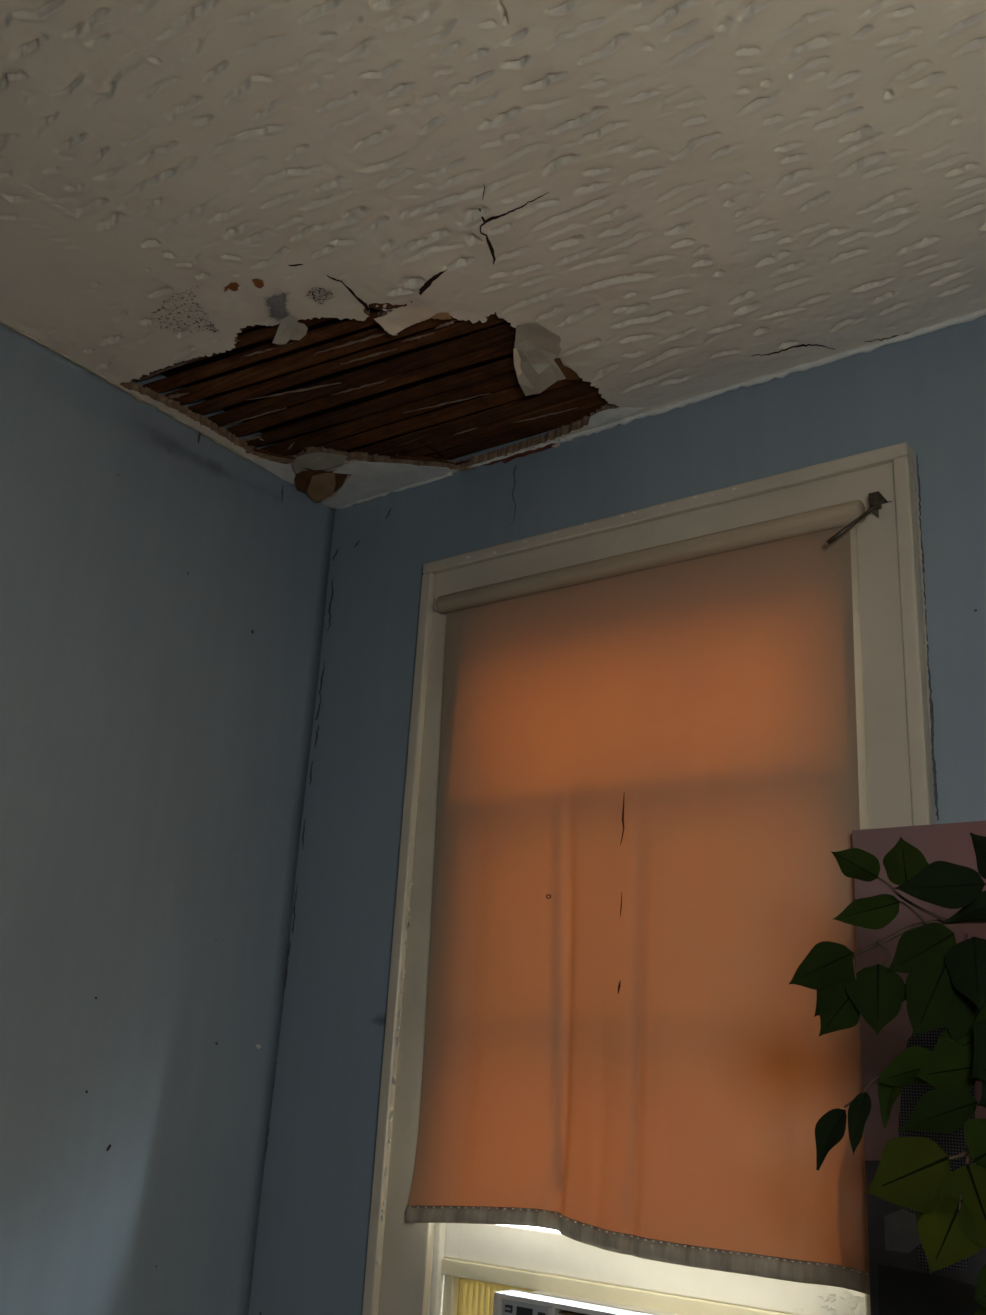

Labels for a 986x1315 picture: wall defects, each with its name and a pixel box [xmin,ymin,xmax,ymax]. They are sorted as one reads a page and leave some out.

crack [479,186,549,265]
peeling [272,316,308,345]
crack [288,264,447,311]
peeling [374,304,452,335]
peeling [513,322,580,396]
peeling [245,440,560,509]